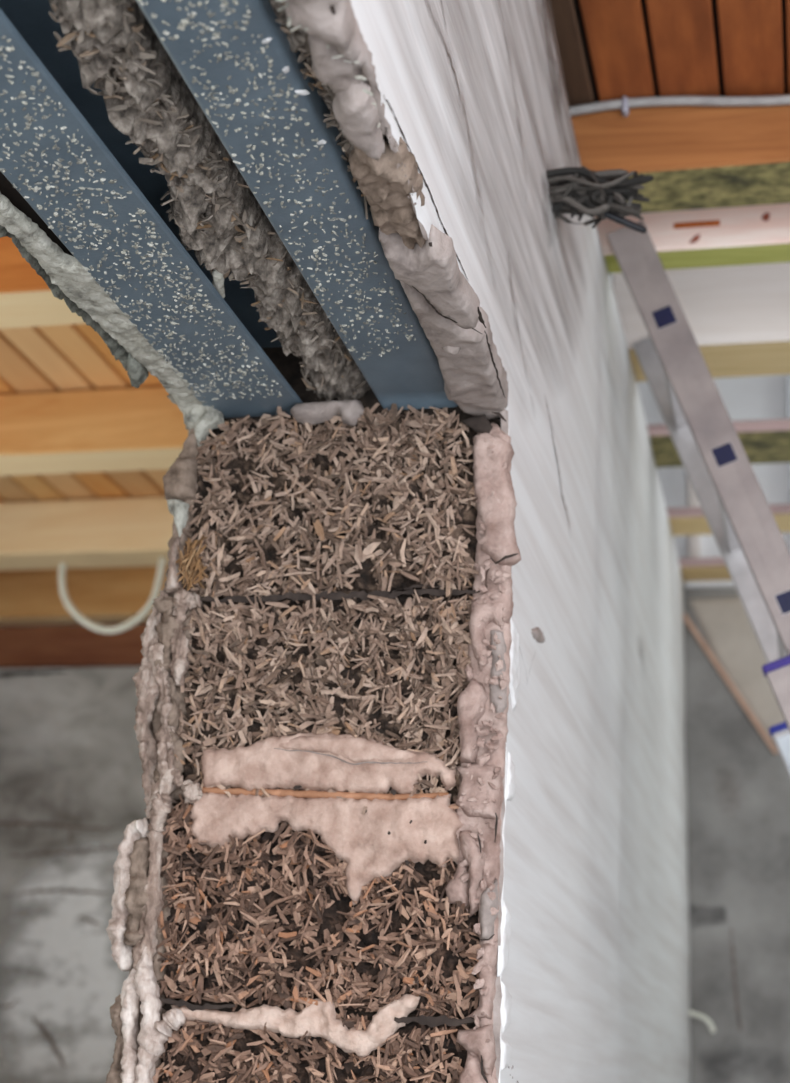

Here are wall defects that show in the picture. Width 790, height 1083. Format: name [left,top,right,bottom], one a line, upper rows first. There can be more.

spalling [275,0,480,329]
crack [545,397,570,525]